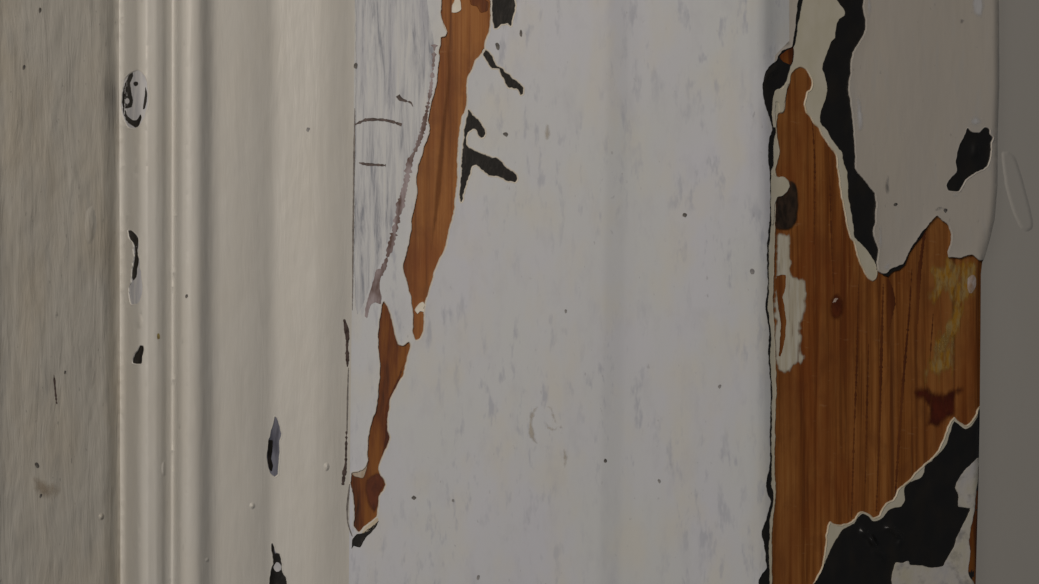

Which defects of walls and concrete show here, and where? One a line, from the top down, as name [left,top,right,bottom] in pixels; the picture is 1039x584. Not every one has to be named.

spalling [120,69,150,130]
spalling [946,126,994,193]
peeling [349,0,525,548]
peeling [758,0,983,584]
spalling [266,415,283,478]
spalling [269,542,289,584]